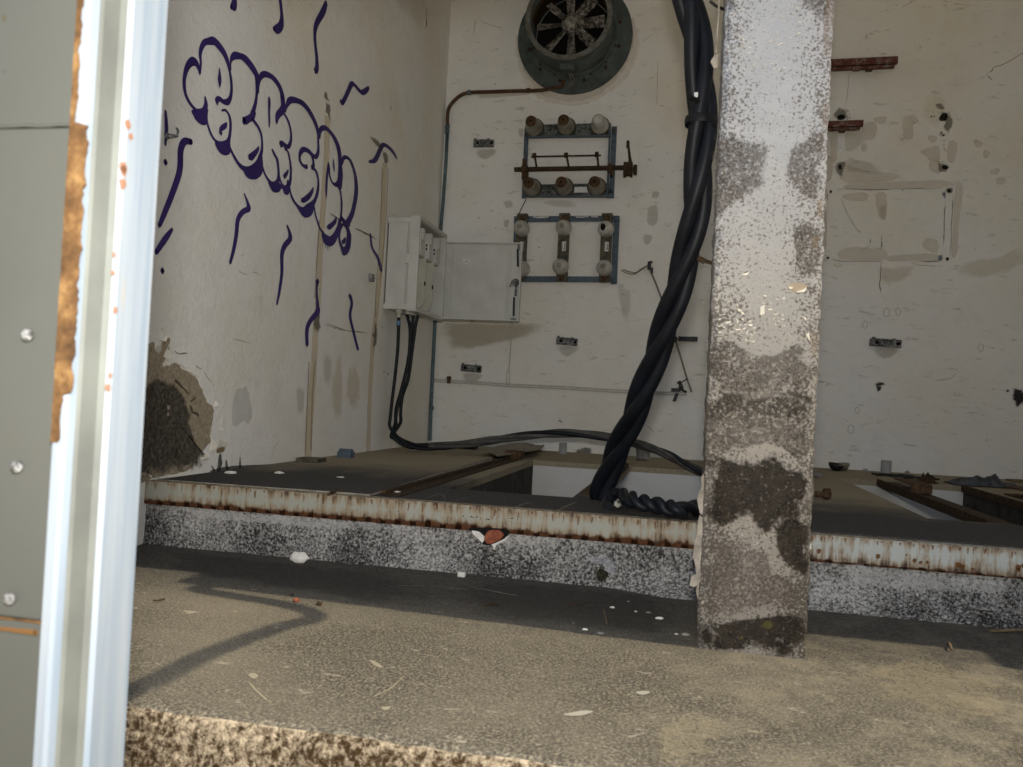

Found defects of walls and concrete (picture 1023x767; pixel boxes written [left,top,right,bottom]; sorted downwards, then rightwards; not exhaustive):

spalling [931,104,952,172]
corrosion [119,161,127,190]
corrosion [50,0,89,442]
peeling [140,335,227,483]
damp [705,341,816,574]
corrosion [144,483,694,549]
corrosion [810,537,1023,579]
corrosion [0,627,38,635]
damp [697,539,806,656]